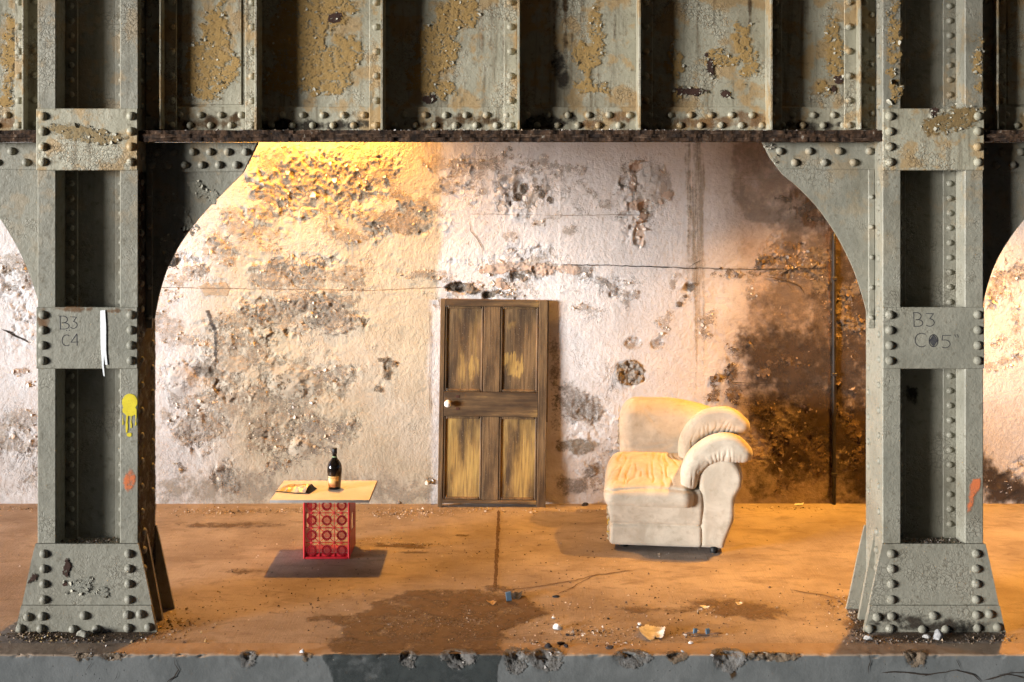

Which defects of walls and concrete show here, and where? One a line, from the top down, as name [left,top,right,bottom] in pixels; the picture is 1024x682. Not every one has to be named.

peeling [185,0,241,102]
peeling [262,0,364,100]
peeling [405,0,482,104]
peeling [664,21,762,102]
peeling [41,123,128,146]
spalling [500,162,586,227]
peeling [155,146,390,363]
spalling [373,356,398,393]
spalling [615,359,644,386]
crack [493,510,632,594]
water stain [307,589,548,682]
spalling [502,646,564,675]